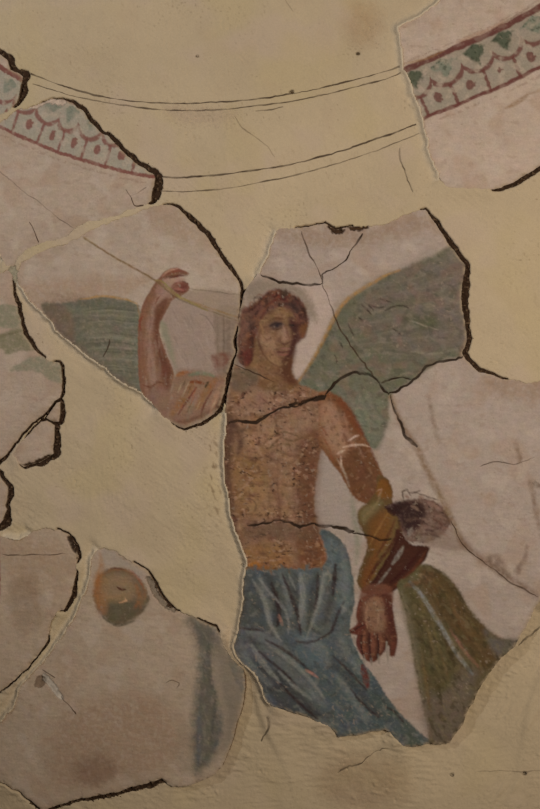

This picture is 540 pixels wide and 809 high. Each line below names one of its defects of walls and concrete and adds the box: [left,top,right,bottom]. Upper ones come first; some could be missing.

crack [0,281,66,531]
crack [0,49,246,308]
crack [172,208,508,447]
spalling [328,226,368,234]
crack [248,520,391,541]
crack [451,522,538,597]